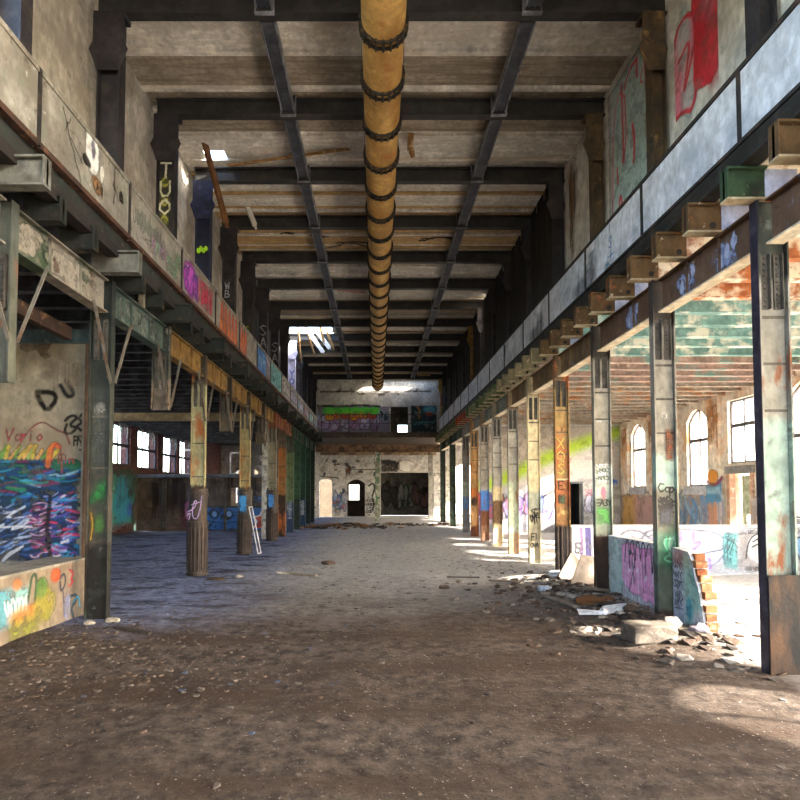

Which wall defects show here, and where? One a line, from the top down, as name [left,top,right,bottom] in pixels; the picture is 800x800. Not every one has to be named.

peeling [677,264,695,295]
peeling [626,303,638,329]
spalling [692,553,719,633]